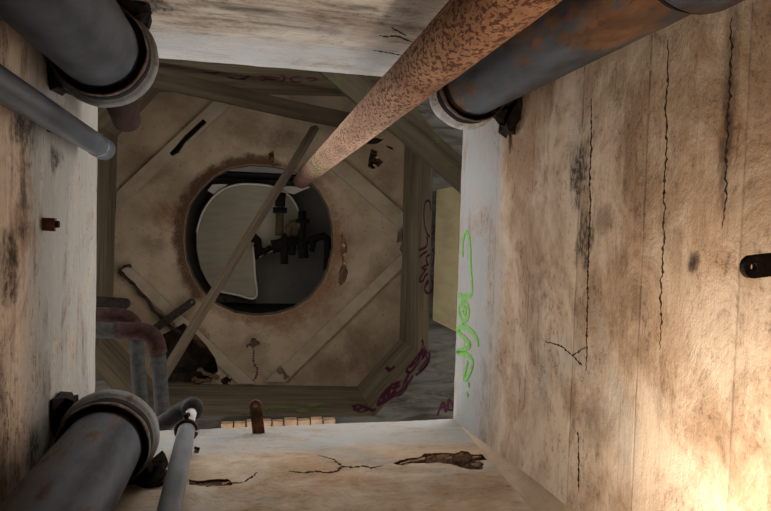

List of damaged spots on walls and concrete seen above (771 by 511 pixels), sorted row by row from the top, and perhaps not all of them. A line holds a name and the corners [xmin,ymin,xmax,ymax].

crack [721,18,734,229]
corrosion [173,155,280,297]
crack [545,99,592,371]
leakage [570,141,593,266]
crack [659,42,669,348]
crack [290,455,383,473]
spalling [399,453,486,470]